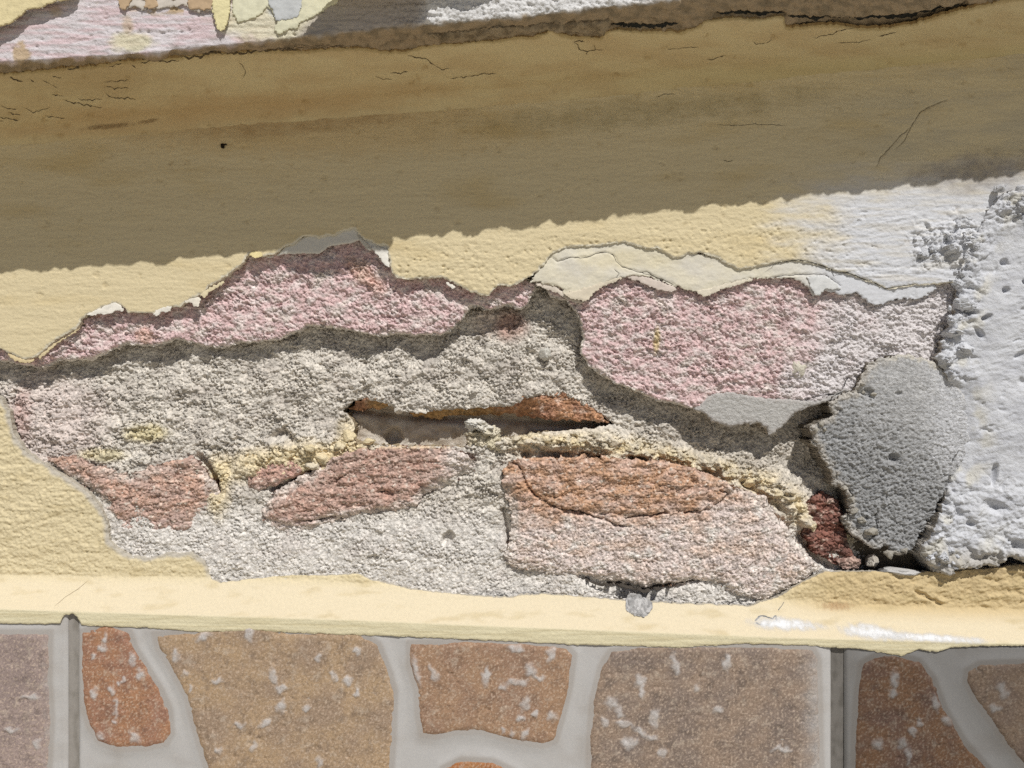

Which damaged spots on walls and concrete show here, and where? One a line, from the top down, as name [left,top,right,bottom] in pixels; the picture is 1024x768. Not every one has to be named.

peeling [0,0,65,27]
peeling [118,0,338,35]
spalling [428,18,612,42]
crack [878,101,943,164]
flaking render [0,229,955,617]